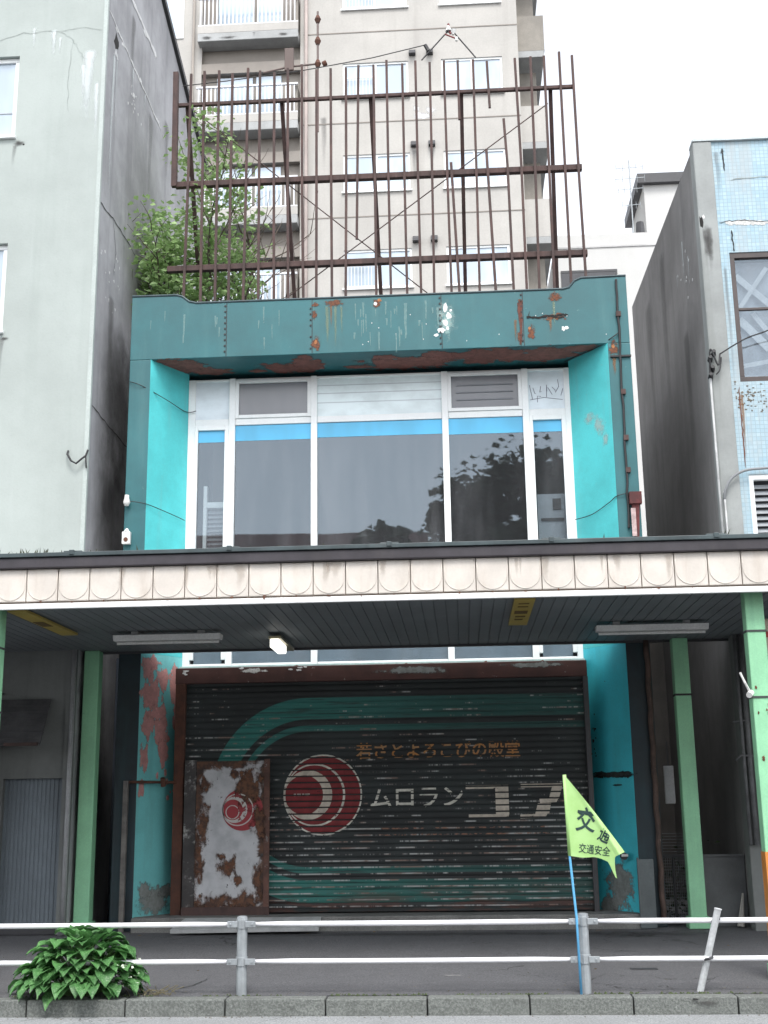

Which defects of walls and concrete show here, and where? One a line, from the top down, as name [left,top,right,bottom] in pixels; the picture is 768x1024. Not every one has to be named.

crack [0,27,103,106]
corrosion [312,300,343,318]
peeling [343,303,598,371]
corrosion [514,299,535,344]
corrosion [734,381,767,468]
peeling [513,660,562,668]
peeling [138,654,188,800]
peeling [601,861,635,911]